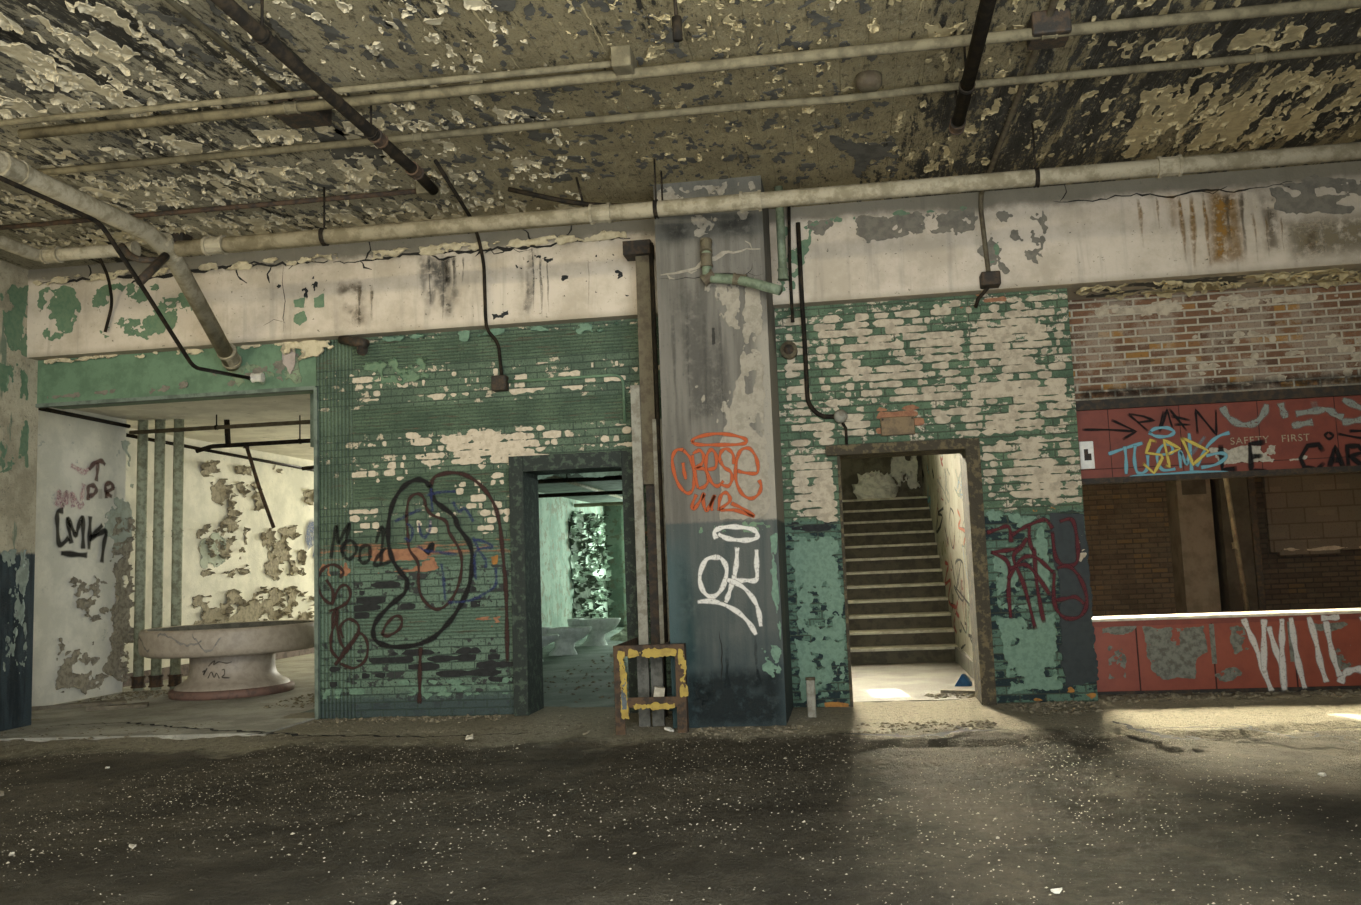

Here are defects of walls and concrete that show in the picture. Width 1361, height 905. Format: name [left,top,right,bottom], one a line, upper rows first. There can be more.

peeling [0,188,147,249]
water stain [424,257,464,311]
peeling [372,230,627,280]
peeling [777,206,978,292]
peeling [977,211,1048,274]
corrosion [1178,195,1240,259]
peeling [0,267,192,400]
peeling [350,333,638,402]
peeling [55,484,136,695]
peeling [192,425,570,627]
peeling [568,510,614,619]
peeling [699,283,1126,707]